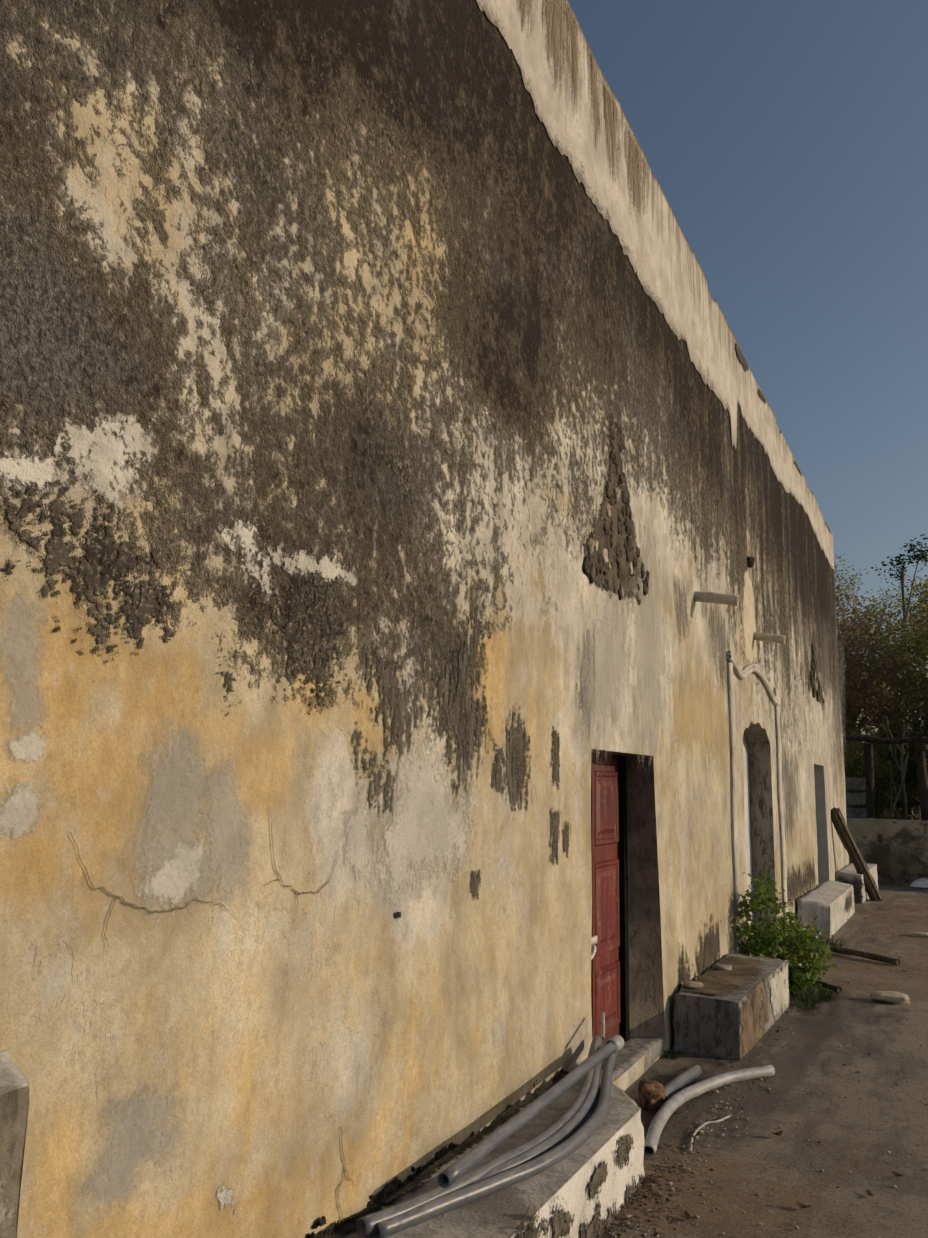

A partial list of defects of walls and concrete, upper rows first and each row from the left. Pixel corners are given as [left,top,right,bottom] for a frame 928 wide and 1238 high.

damp [0,463,197,667]
damp [214,636,243,716]
damp [248,545,533,819]
damp [551,725,560,792]
damp [576,630,600,734]
spalling [583,418,651,606]
damp [674,576,690,638]
damp [709,569,757,690]
damp [820,616,846,796]
crack [70,832,230,952]
crack [265,813,340,911]
damp [550,808,571,865]